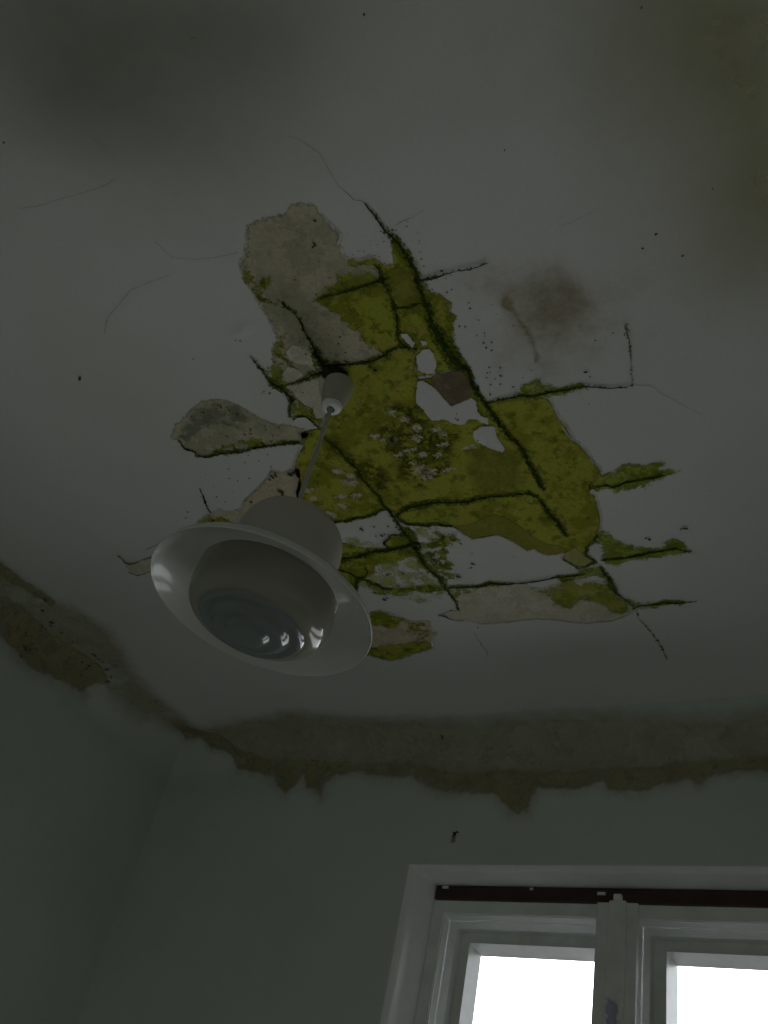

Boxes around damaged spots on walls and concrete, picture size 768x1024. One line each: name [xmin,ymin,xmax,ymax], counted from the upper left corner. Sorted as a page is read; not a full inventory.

peeling [117,555,152,576]
flaking render [171,202,637,661]
crack [178,136,668,659]